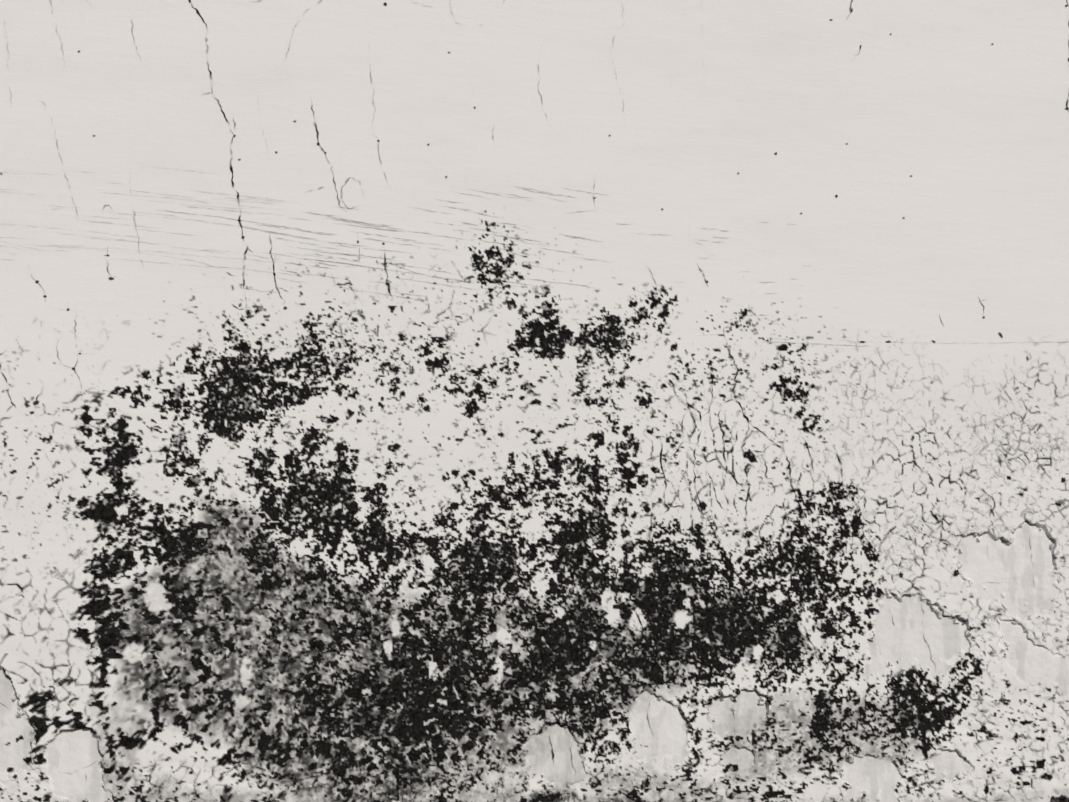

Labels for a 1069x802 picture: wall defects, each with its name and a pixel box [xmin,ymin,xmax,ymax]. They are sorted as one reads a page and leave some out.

crack [218,101,287,310]
mould [0,221,1069,802]
crack [649,349,1058,593]
flaking render [0,667,113,802]
flaking render [842,754,904,802]
flaking render [860,594,972,690]
flaking render [929,749,975,788]
flaking render [953,520,1069,709]